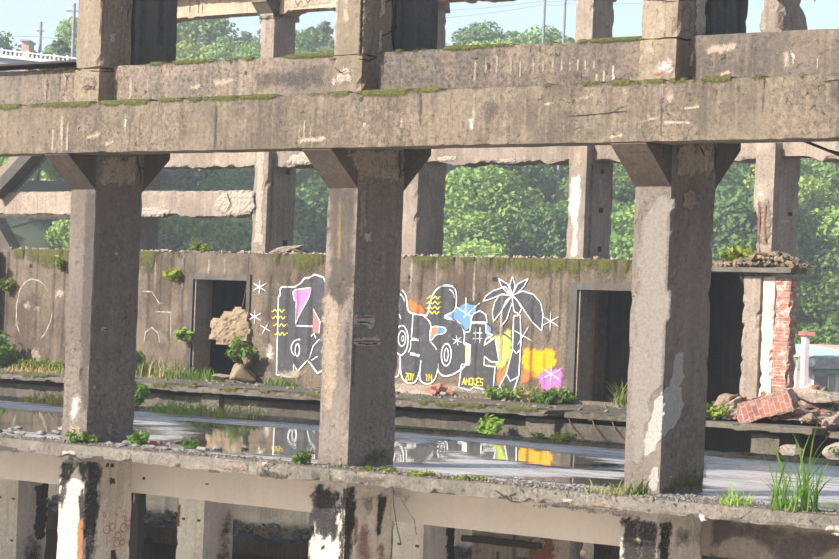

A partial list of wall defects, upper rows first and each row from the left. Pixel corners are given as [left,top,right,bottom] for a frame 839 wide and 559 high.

crack [127,0,136,62]
peeling [612,194,685,464]
leakage [58,462,102,559]
leakage [308,536,320,559]
leakage [338,476,382,559]
peeling [648,467,659,491]